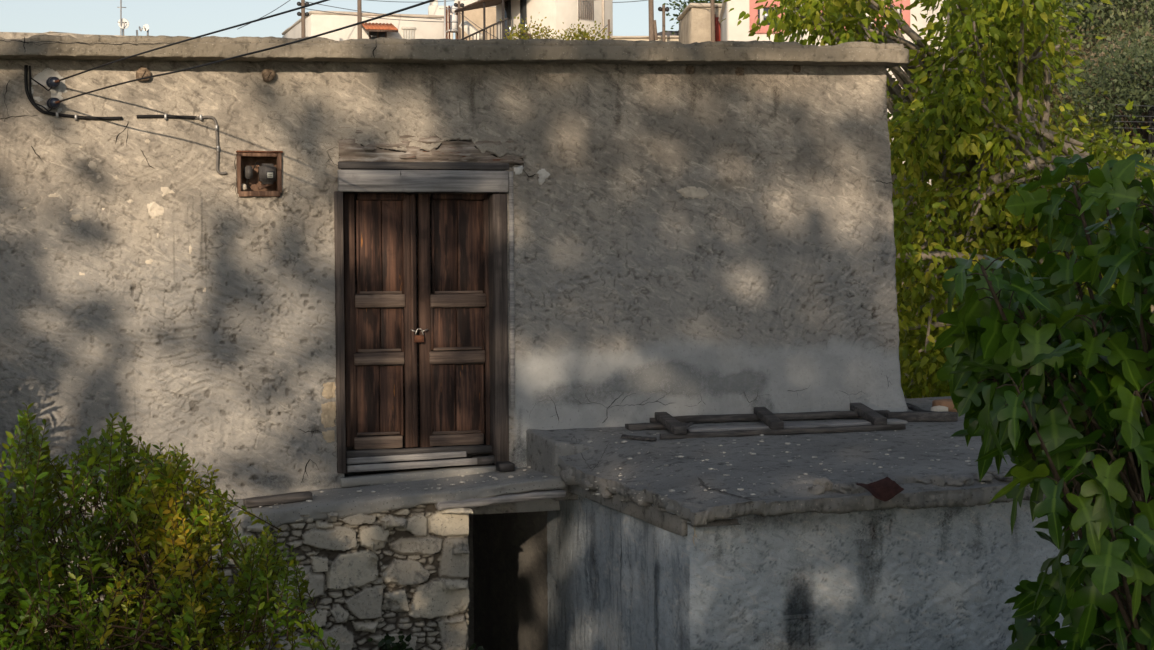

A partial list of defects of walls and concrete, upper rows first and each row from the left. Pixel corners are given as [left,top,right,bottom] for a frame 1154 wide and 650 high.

spalling [357,135,524,175]
flaking render [537,169,550,185]
crack [529,390,706,468]
rust [856,477,904,502]
leakage [785,583,812,650]